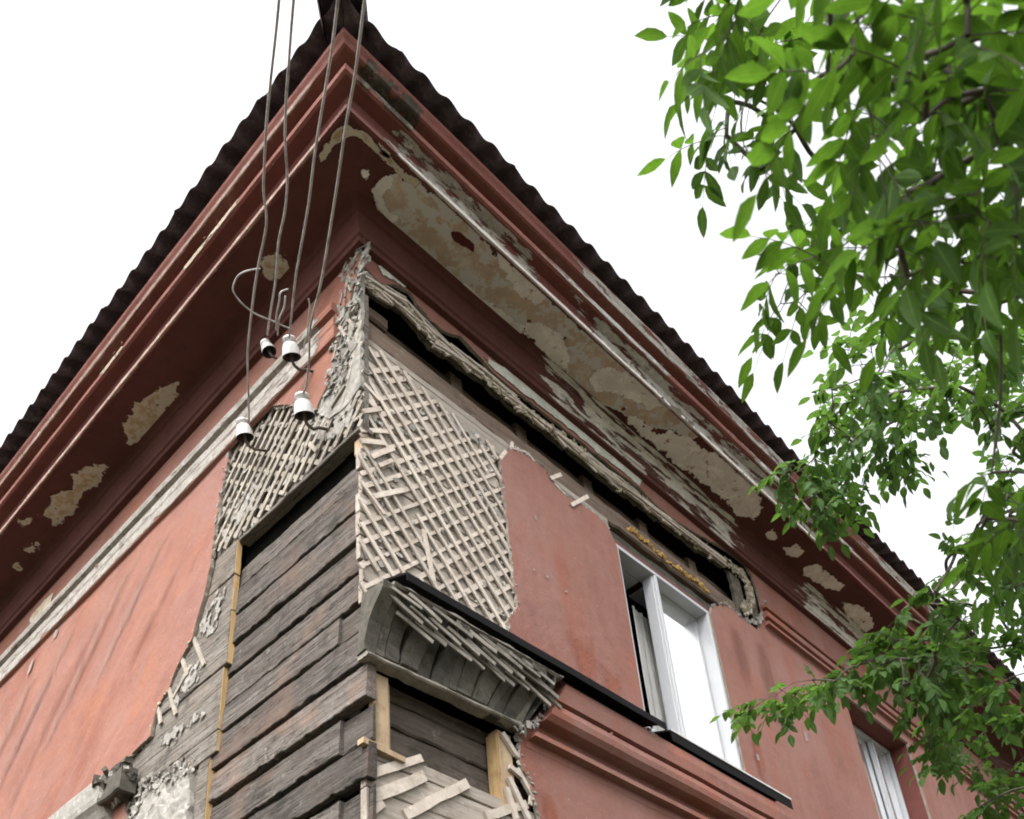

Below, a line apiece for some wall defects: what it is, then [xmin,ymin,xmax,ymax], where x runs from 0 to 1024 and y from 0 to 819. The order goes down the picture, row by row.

peeling [0,73,874,681]
spalling [123,755,196,819]